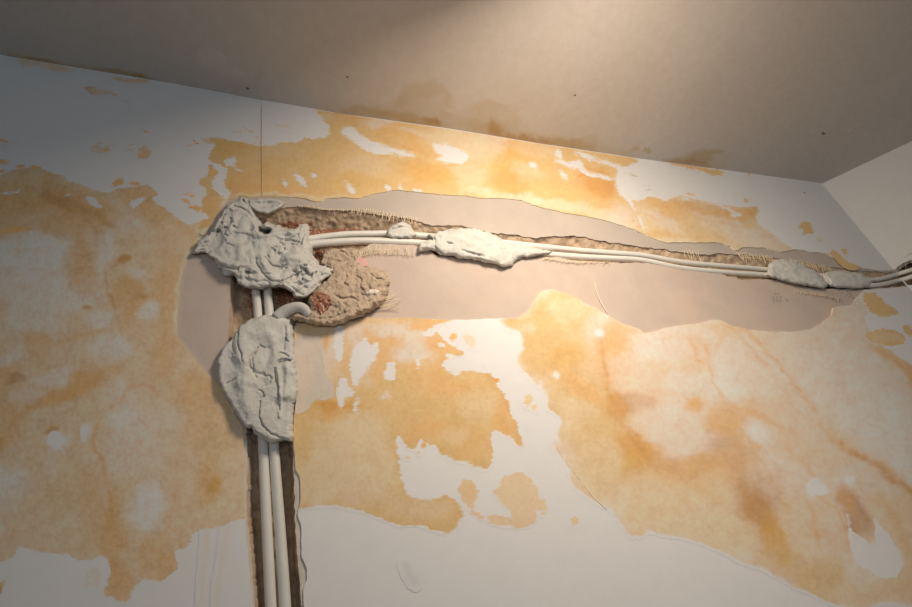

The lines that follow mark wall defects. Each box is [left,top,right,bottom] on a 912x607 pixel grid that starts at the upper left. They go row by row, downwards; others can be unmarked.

flaking render [275,289,299,306]
damp [0,74,796,607]
peeling [204,191,902,273]
peeling [350,243,905,333]
damp [795,219,861,270]
peeling [177,246,255,607]
peeling [292,445,307,607]
damp [293,289,912,607]